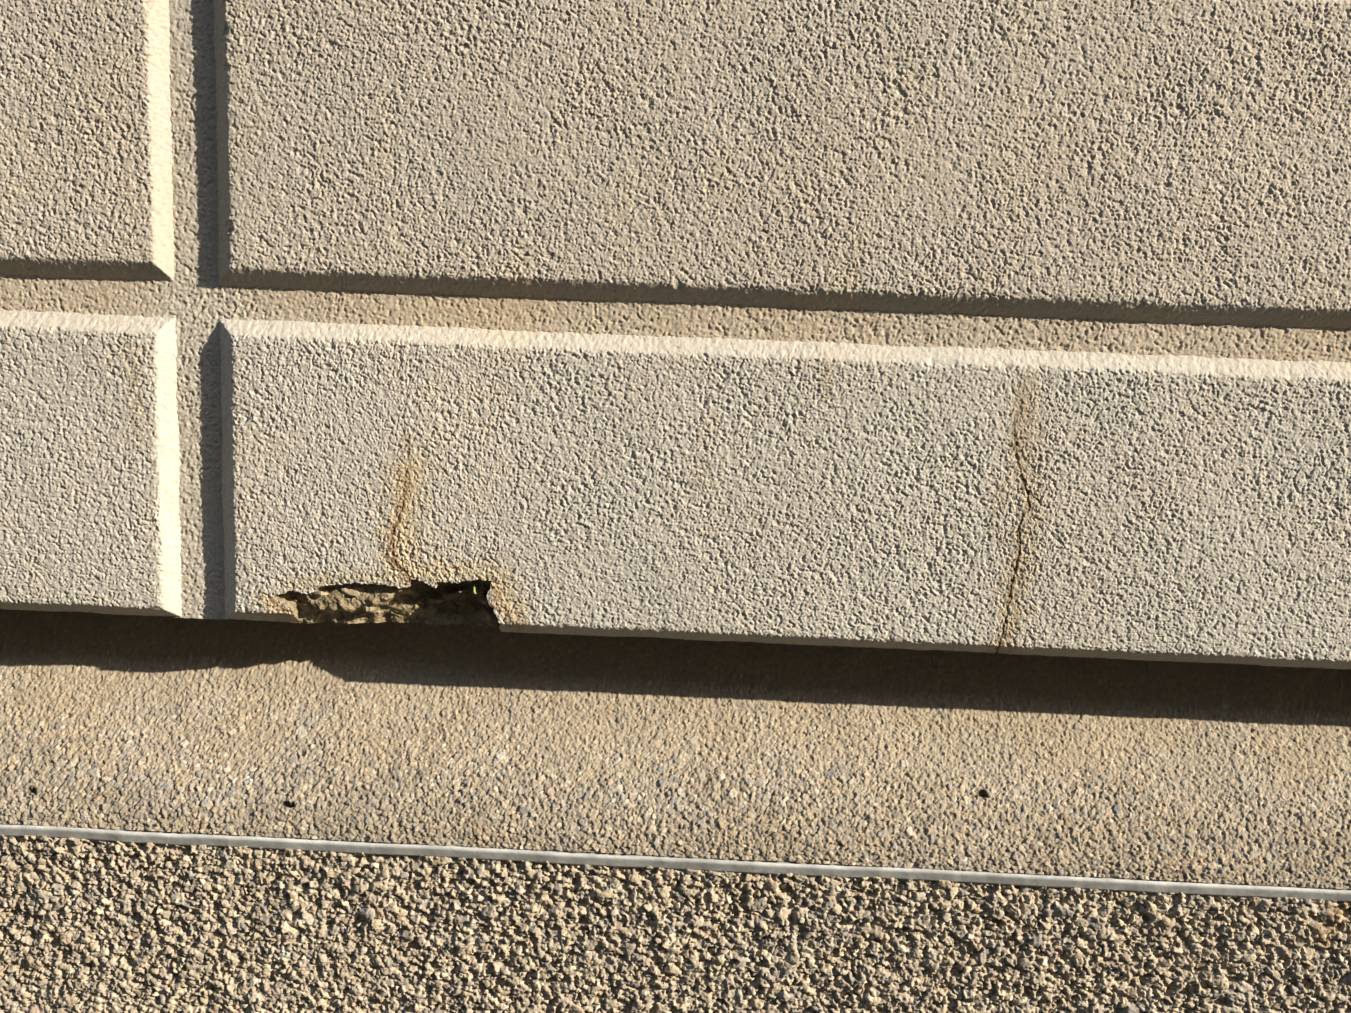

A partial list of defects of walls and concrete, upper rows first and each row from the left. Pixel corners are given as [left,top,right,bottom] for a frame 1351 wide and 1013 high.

crack [391,491,410,583]
crack [995,412,1042,653]
spalling [270,579,500,628]